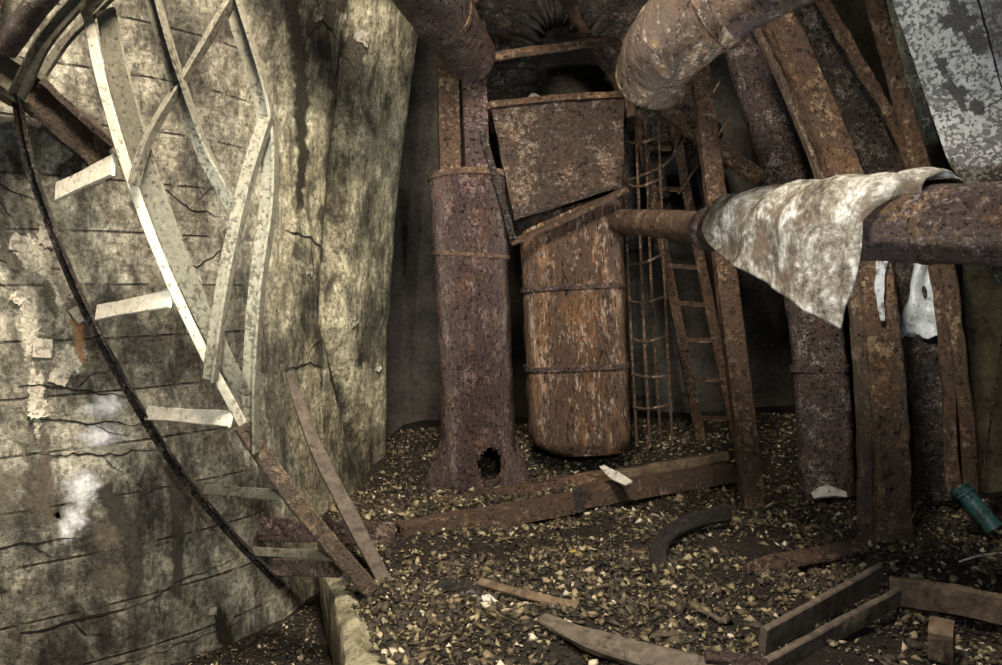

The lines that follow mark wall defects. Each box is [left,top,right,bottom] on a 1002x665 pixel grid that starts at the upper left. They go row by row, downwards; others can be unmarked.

crack [977,0,1002,115]
water stain [284,0,310,213]
crack [19,371,125,397]
water stain [86,396,122,415]
water stain [322,339,339,404]
crack [36,418,158,472]
water stain [83,427,116,445]
water stain [0,435,145,597]
crack [0,534,94,557]
crack [20,556,239,635]
crack [113,620,243,665]